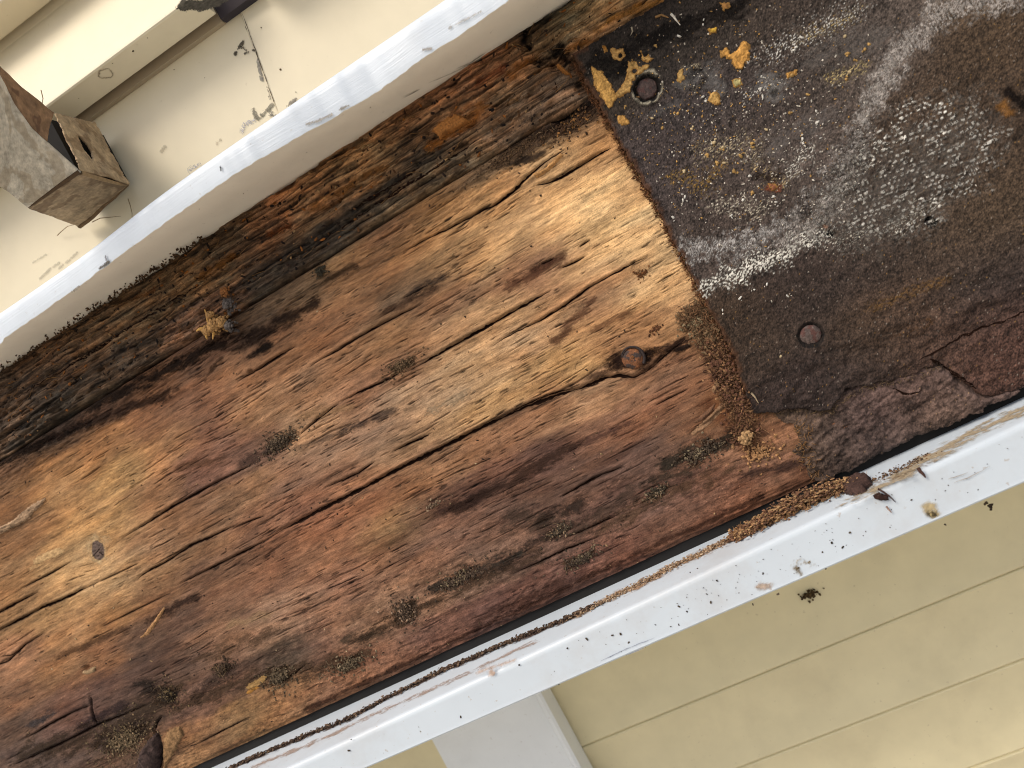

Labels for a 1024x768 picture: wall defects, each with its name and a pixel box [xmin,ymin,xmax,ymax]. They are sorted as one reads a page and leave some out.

water stain [504,101,597,166]
water stain [669,0,1024,298]
crack [408,149,609,250]
water stain [505,252,565,292]
water stain [0,296,320,467]
crack [238,305,420,381]
crack [301,258,644,434]
water stain [551,299,594,343]
rust [589,336,689,379]
water stain [340,408,396,435]
crack [0,341,683,664]
crack [16,698,163,767]